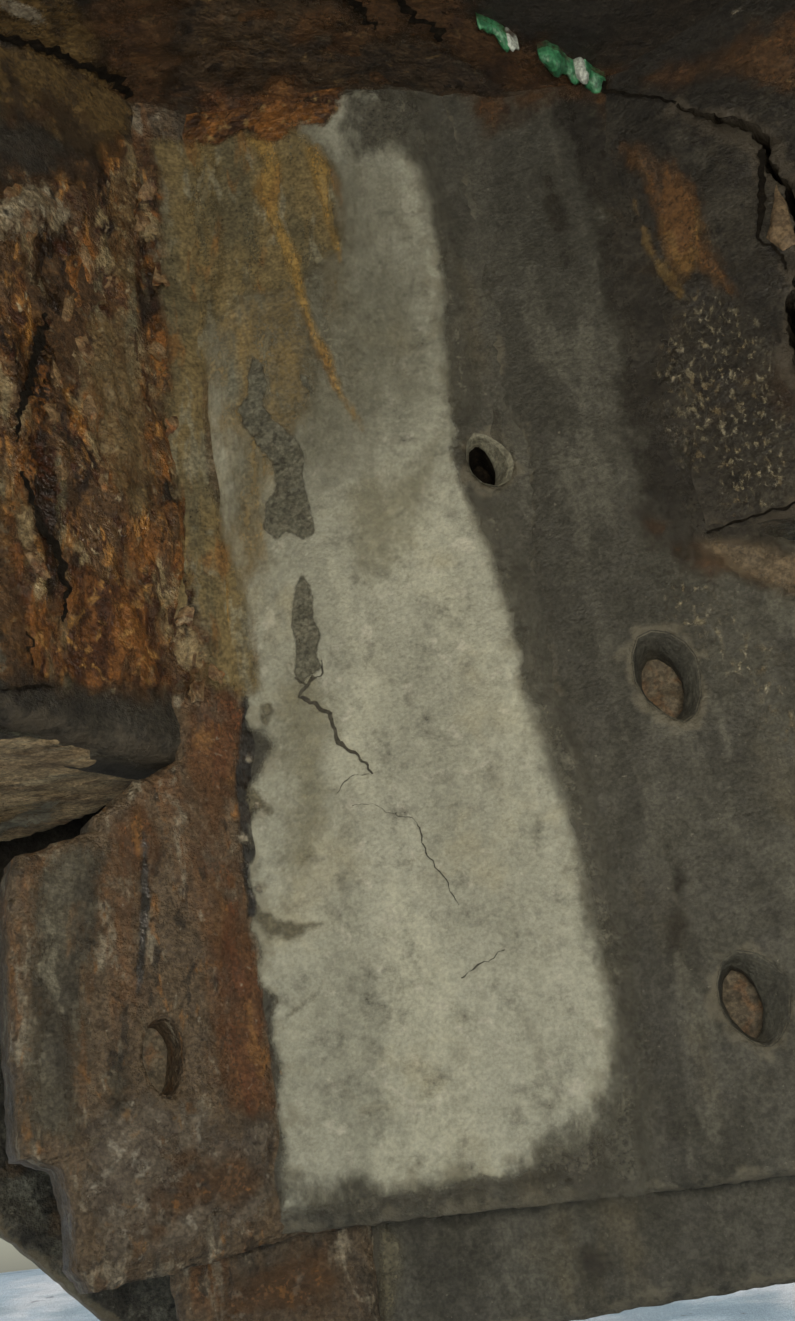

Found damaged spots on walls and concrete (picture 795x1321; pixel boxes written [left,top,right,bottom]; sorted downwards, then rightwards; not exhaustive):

crack [0,33,134,100]
rust [319,0,581,92]
rust [182,70,389,394]
rust [625,144,729,290]
crack [601,80,795,365]
rust [0,0,279,1115]
crack [706,501,795,534]